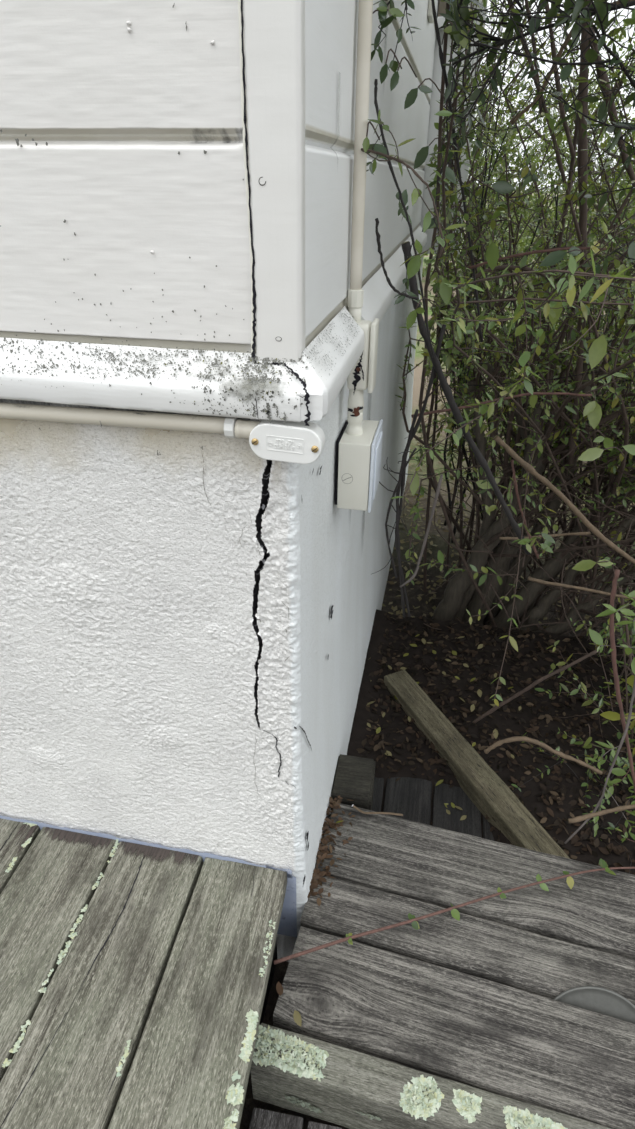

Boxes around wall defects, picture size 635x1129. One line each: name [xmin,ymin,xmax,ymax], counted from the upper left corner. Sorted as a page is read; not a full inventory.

leakage [0,311,358,428]
crack [239,460,312,791]